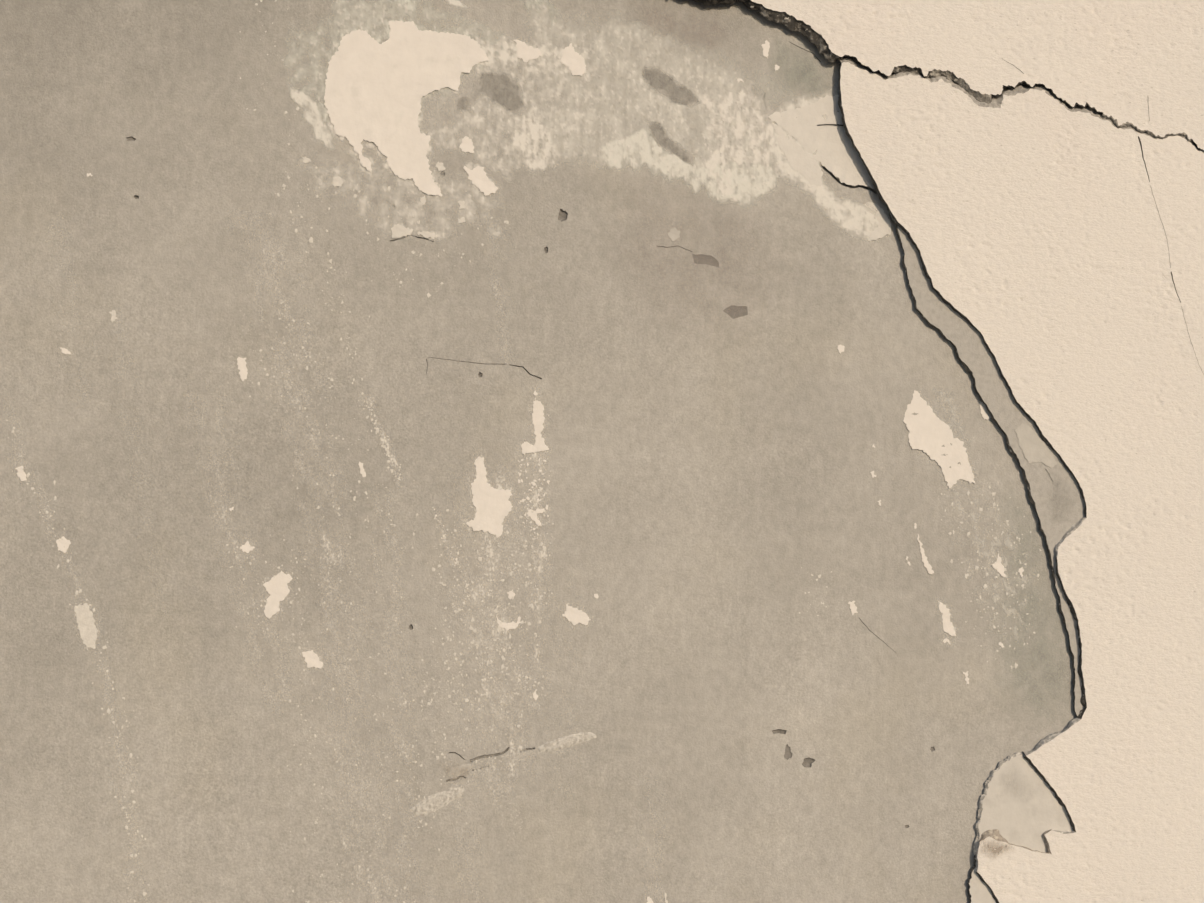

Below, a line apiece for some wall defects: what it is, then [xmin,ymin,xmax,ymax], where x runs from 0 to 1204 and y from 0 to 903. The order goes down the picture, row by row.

flaking render [403,0,544,67]
peeling [391,215,425,238]
flaking render [541,0,1087,557]
peeling [521,400,549,455]
peeling [466,456,513,538]
flaking render [1038,517,1056,588]
peeling [263,571,293,619]
peeling [562,604,591,626]
flaking render [1056,557,1087,719]
flaking render [1024,718,1081,834]
flaking render [973,752,1044,903]
flaking render [967,854,976,903]